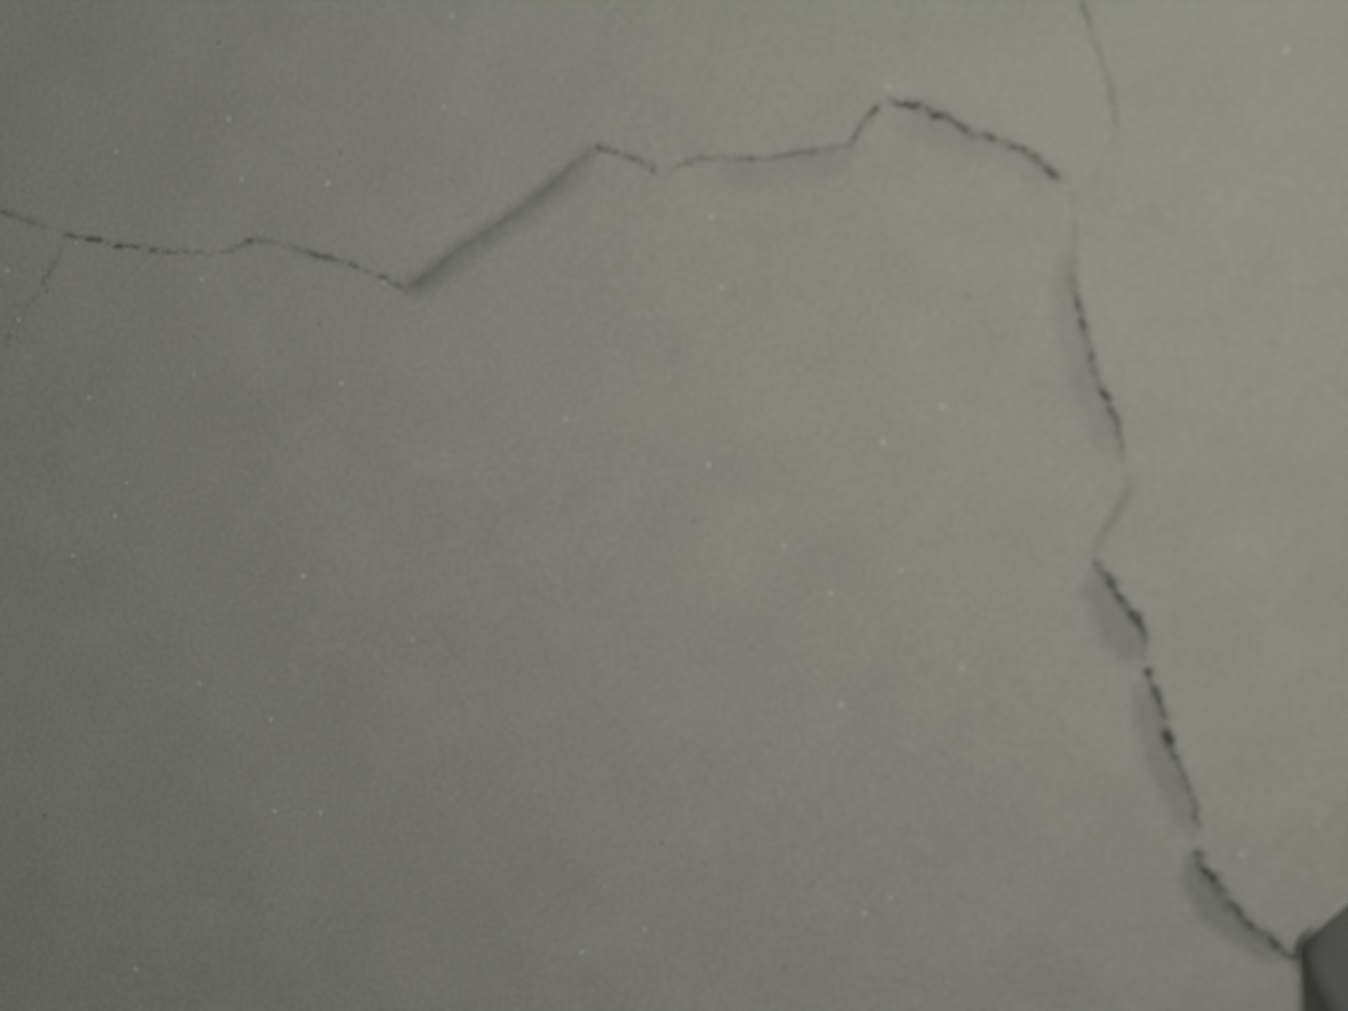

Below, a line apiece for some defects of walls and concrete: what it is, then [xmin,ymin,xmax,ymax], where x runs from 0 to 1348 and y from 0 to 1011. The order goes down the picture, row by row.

crack [897,103,959,125]
crack [1164,731,1173,745]